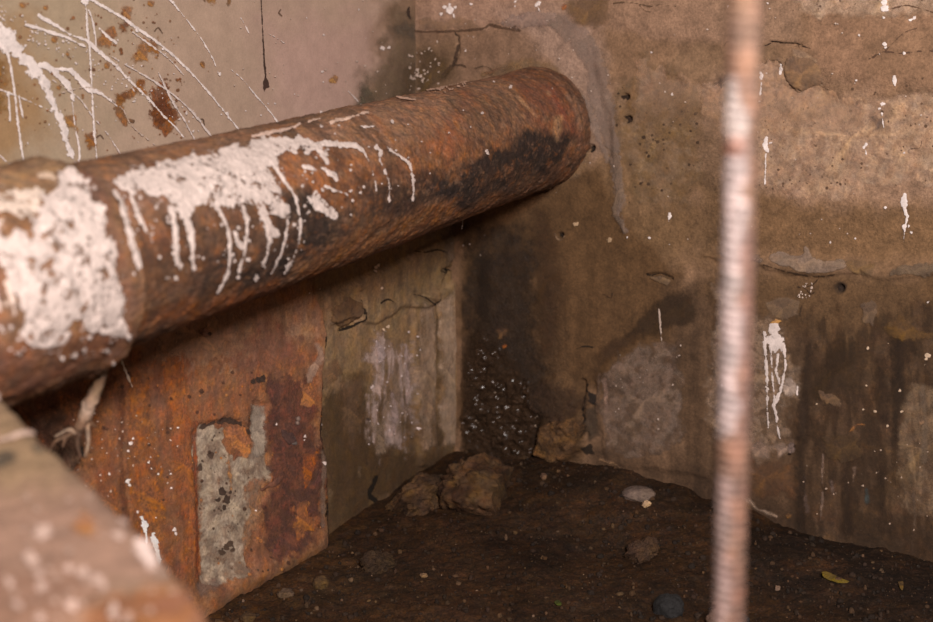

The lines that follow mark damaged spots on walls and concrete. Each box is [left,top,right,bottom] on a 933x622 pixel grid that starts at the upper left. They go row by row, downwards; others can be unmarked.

rust [65,115,100,150]
rust [82,7,185,139]
crack [441,32,492,76]
crack [765,40,808,48]
crack [869,28,933,59]
rust [15,309,328,607]
spalling [191,404,271,586]
damp [707,290,721,439]
damp [746,297,933,562]